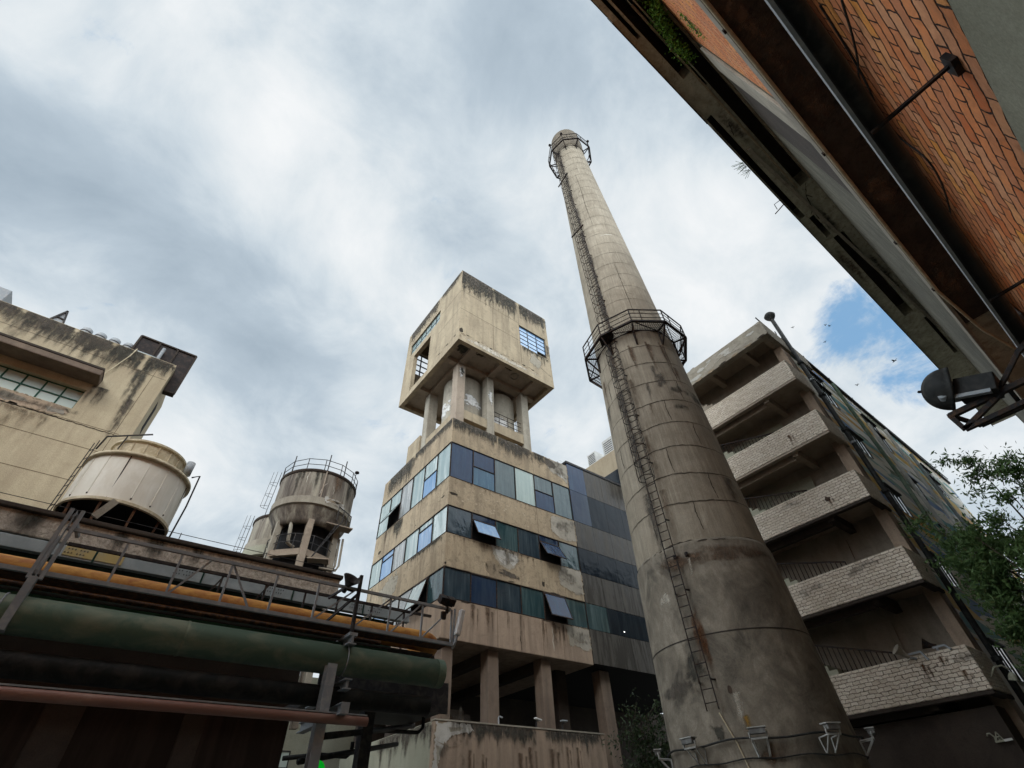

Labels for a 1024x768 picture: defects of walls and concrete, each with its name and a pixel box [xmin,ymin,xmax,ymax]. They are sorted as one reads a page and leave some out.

damp [410,271,545,339]
damp [0,300,175,427]
damp [389,399,556,492]
flaking render [549,514,577,542]
flaking render [485,545,585,596]
damp [465,723,602,768]